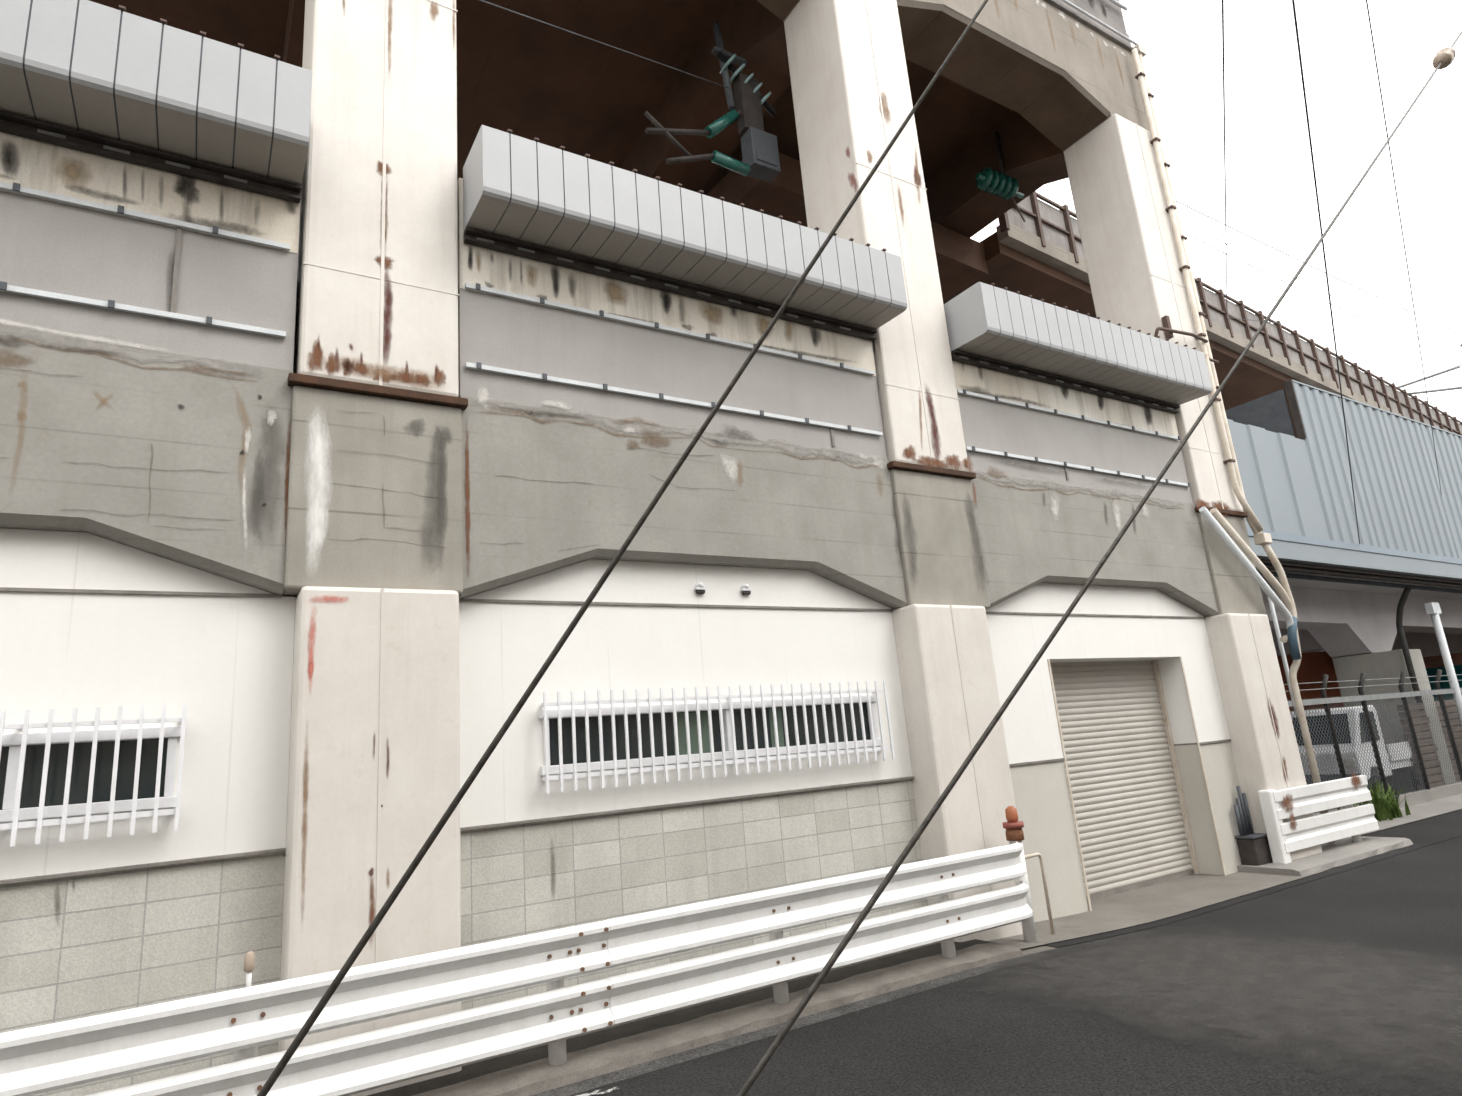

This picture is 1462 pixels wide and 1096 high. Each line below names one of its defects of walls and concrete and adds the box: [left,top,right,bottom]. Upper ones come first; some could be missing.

rust [309,161,445,386]
damp [240,395,276,455]
rust [904,390,972,472]
damp [242,456,272,538]
damp [427,432,448,541]